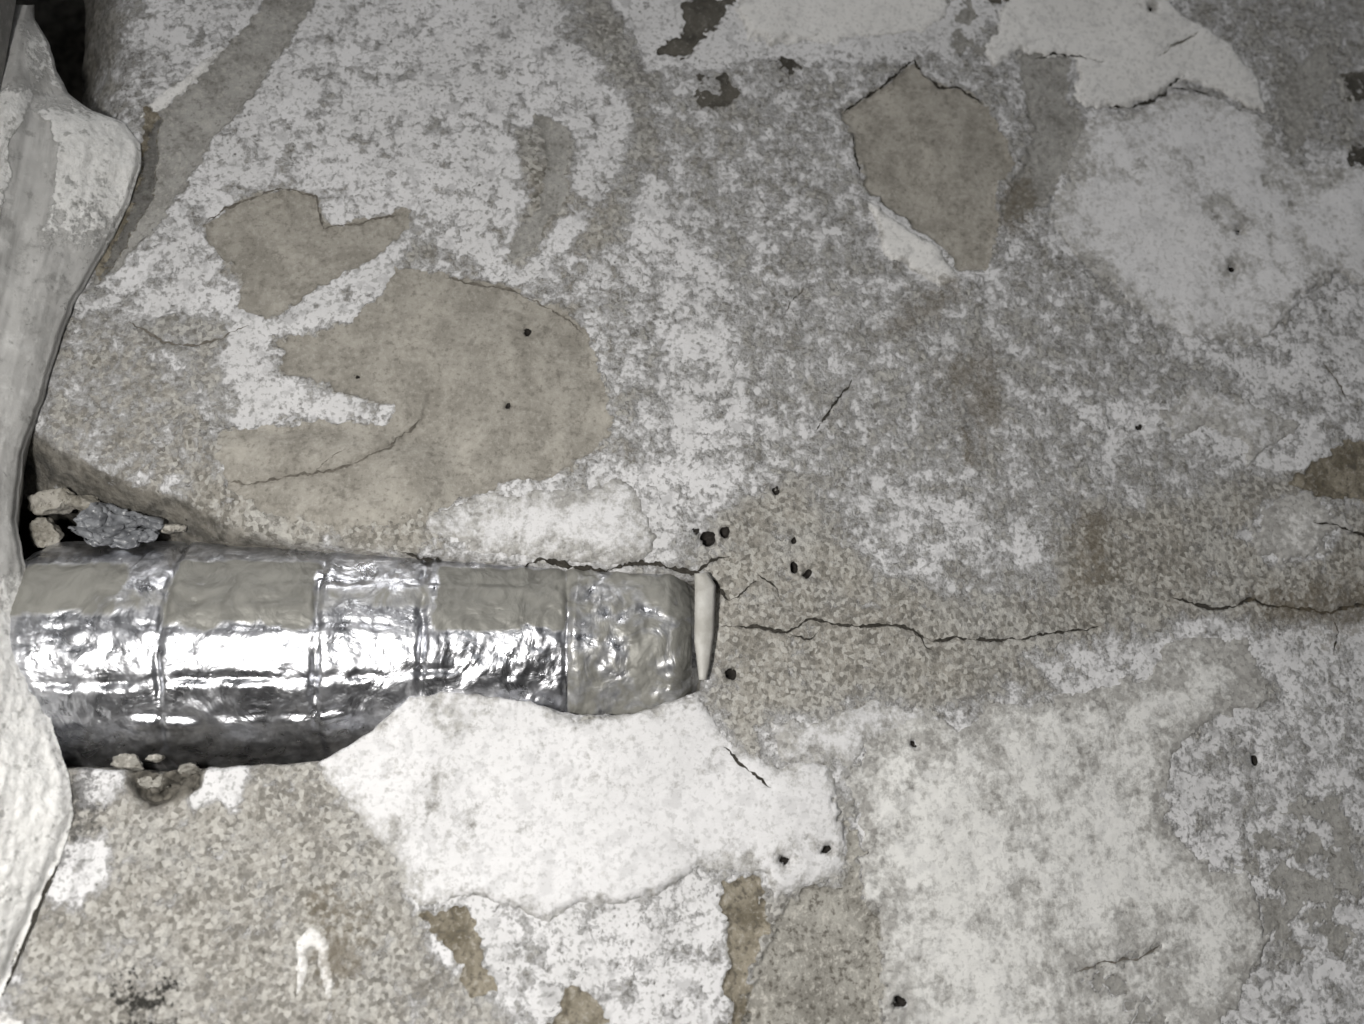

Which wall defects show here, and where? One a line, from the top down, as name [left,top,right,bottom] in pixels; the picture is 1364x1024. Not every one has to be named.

peeling [94,0,314,285]
flaking render [657,0,1364,348]
peeling [203,190,411,319]
peeling [215,266,657,567]
crack [401,552,441,562]
crack [525,556,1098,650]
crack [1174,597,1364,655]
flaking render [1247,439,1364,566]
flaking render [320,632,1364,1024]
flaking render [295,926,334,998]